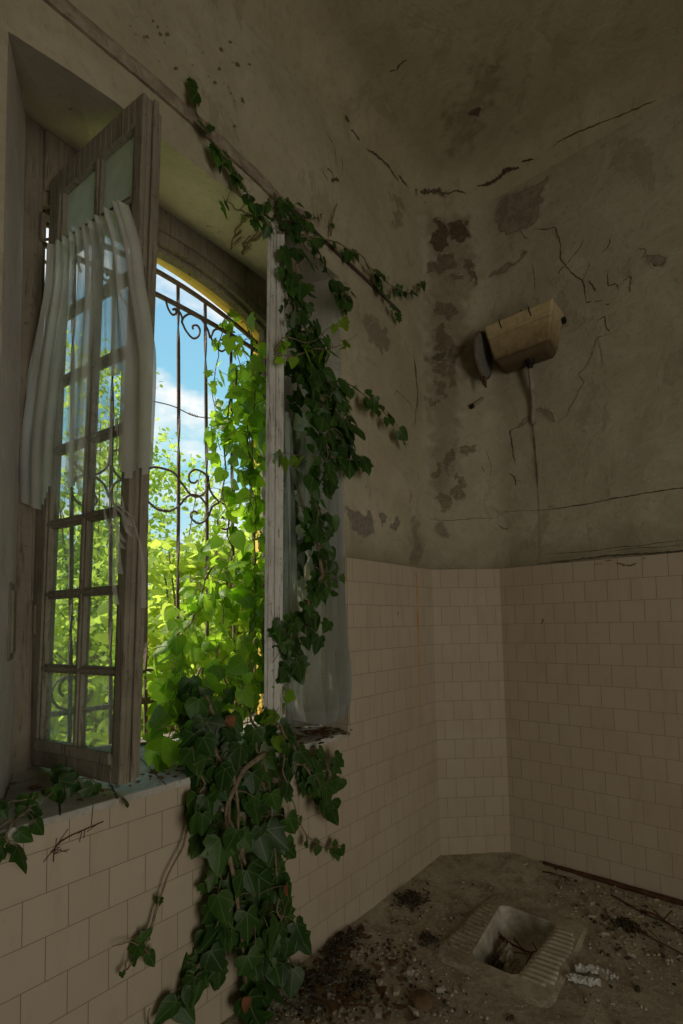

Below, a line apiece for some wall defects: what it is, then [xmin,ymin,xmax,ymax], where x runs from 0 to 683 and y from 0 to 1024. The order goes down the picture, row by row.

crack [322,100,655,195]
spalling [428,218,527,285]
crack [519,227,663,331]
peeling [345,506,400,538]
crack [435,487,683,521]